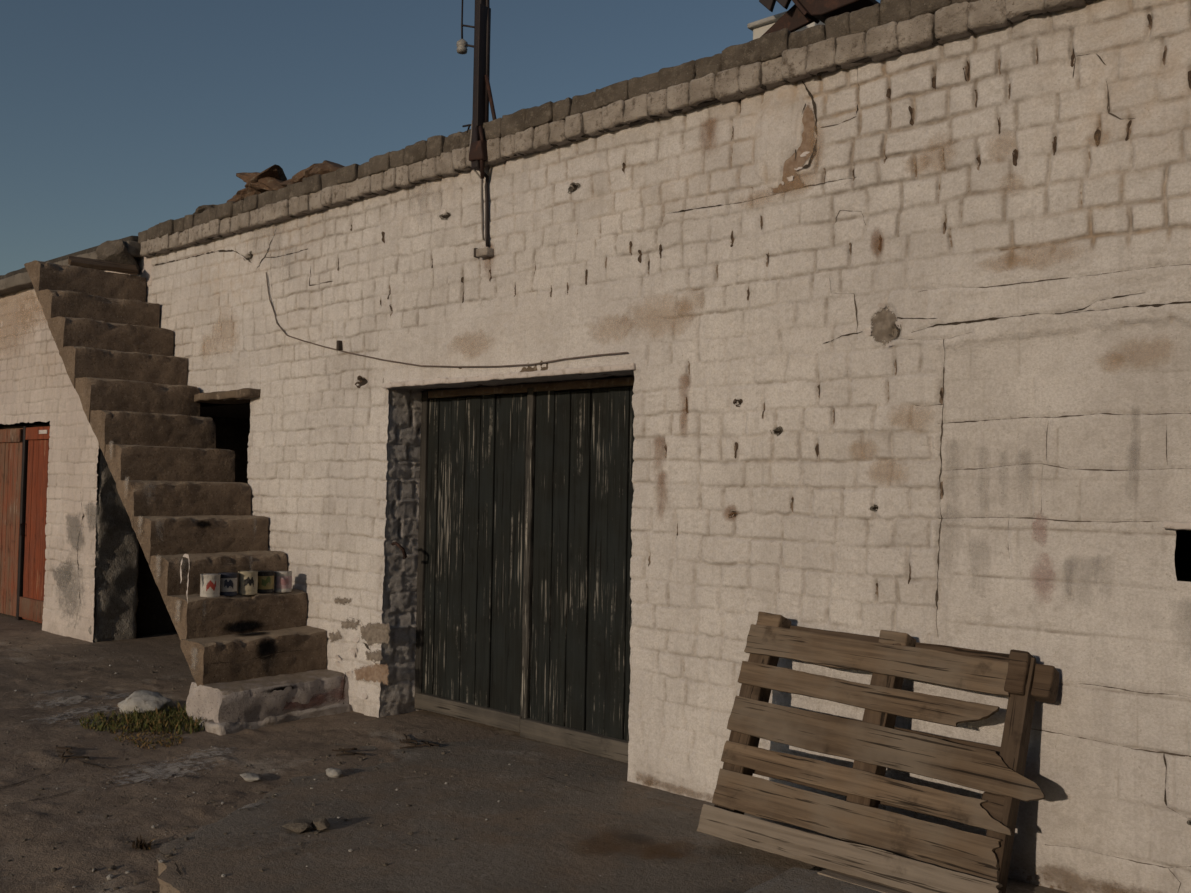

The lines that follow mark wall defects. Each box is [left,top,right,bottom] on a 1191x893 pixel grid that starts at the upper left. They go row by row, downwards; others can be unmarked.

spalling [823,303,936,347]
crack [908,264,1191,633]
peeling [329,597,390,699]